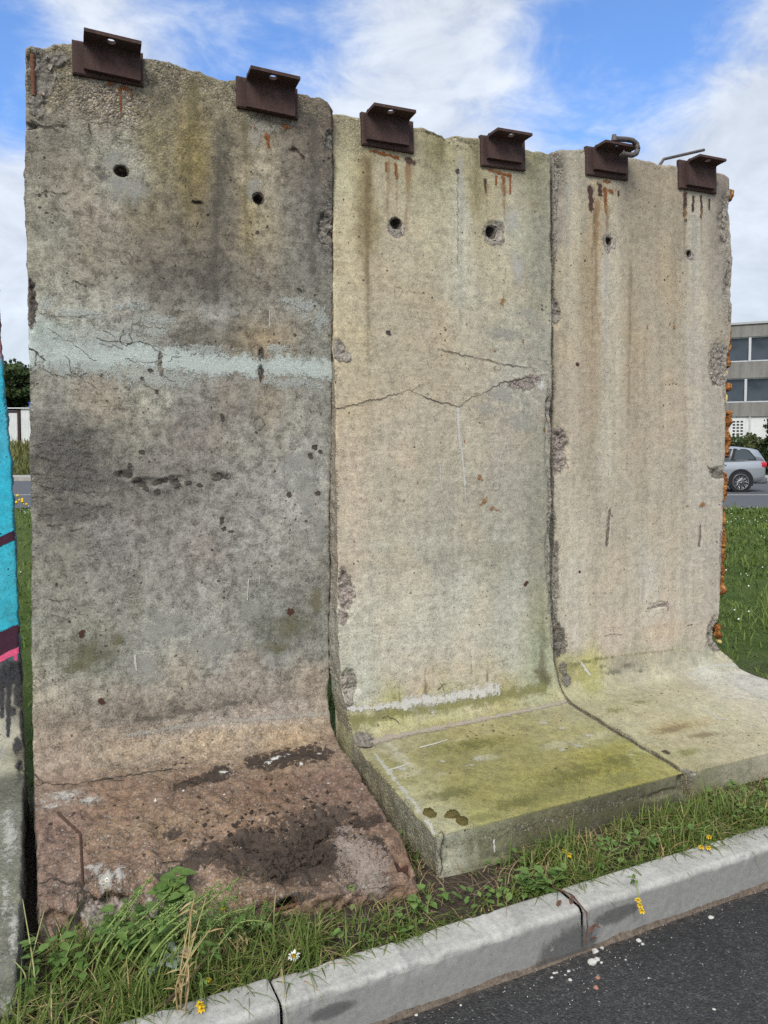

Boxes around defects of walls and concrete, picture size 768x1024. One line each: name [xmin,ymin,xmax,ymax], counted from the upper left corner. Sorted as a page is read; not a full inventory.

rust [370,149,416,190]
rust [483,168,512,205]
rust [587,179,620,248]
rust [683,192,710,221]
crack [29,313,182,391]
crack [336,349,548,409]
spalling [508,373,571,687]
spalling [337,569,356,626]
crack [34,768,185,785]
damp [374,754,438,834]
spalling [56,811,189,936]
spalling [327,825,392,903]